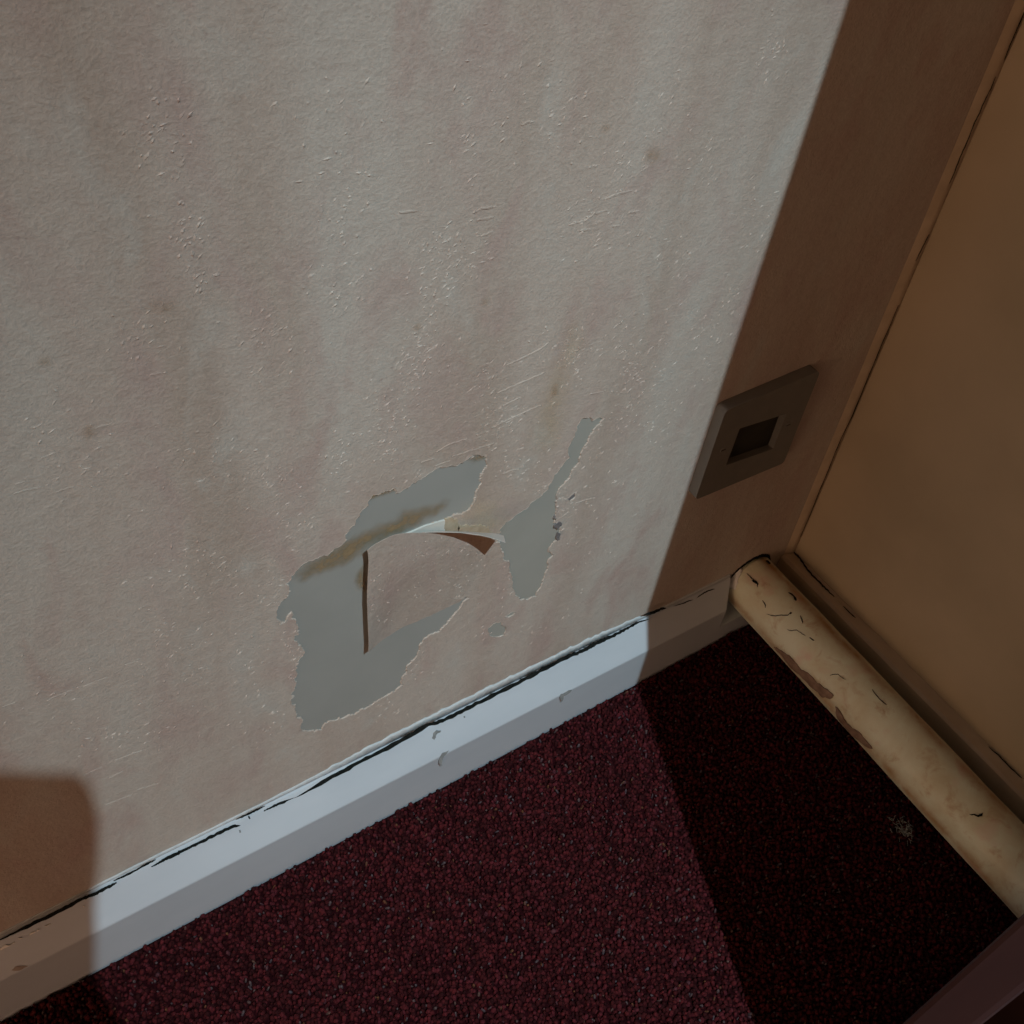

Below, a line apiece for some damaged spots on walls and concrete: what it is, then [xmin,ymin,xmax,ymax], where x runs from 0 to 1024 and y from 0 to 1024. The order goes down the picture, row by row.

crack [949,13,1024,184]
peeling [276,417,605,732]
crack [0,305,899,940]